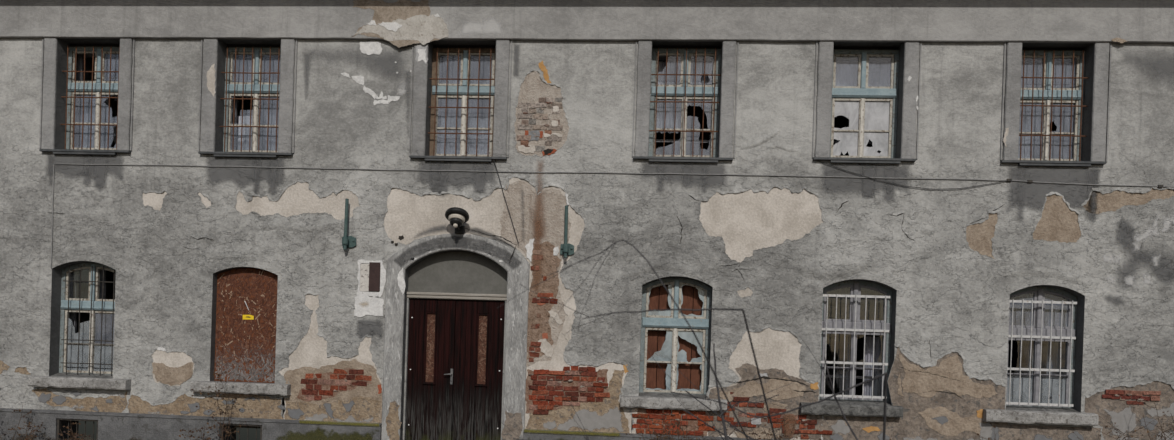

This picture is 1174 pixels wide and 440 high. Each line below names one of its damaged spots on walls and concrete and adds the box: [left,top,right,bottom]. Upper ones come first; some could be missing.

flaking render [351,0,449,73]
peeling [341,72,400,105]
flaking render [513,60,571,158]
flaking render [233,179,361,220]
flaking render [382,175,1174,440]
flaking render [0,290,402,440]